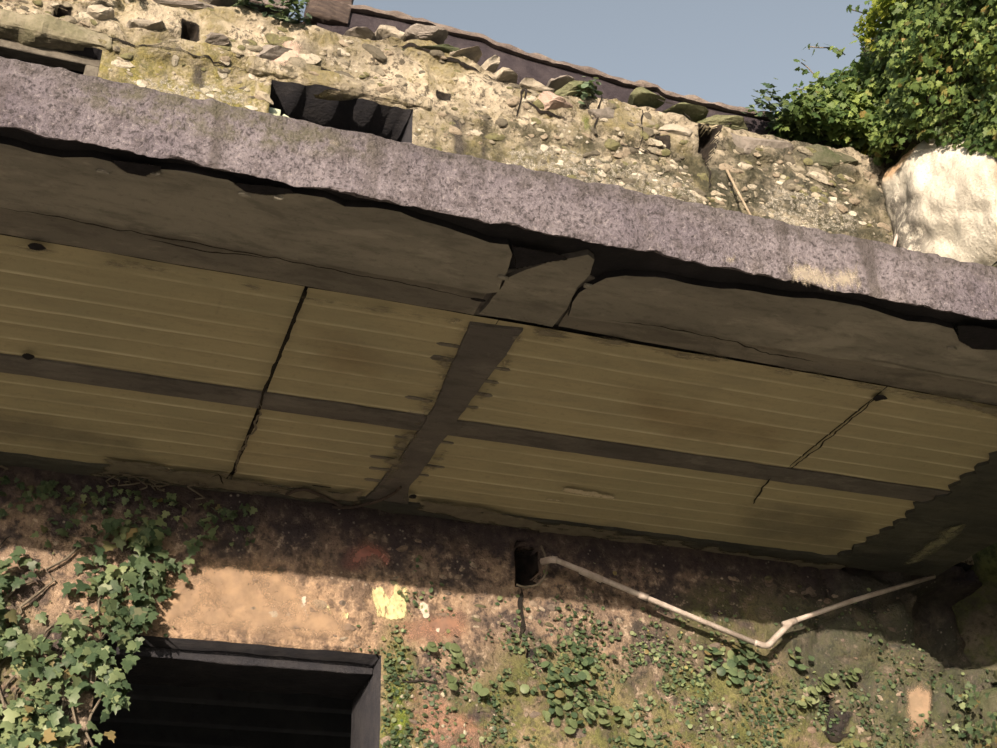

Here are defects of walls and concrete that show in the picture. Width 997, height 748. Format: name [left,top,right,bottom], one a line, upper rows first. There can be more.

crack [4,208,488,301]
crack [213,291,307,484]
crack [791,400,874,468]